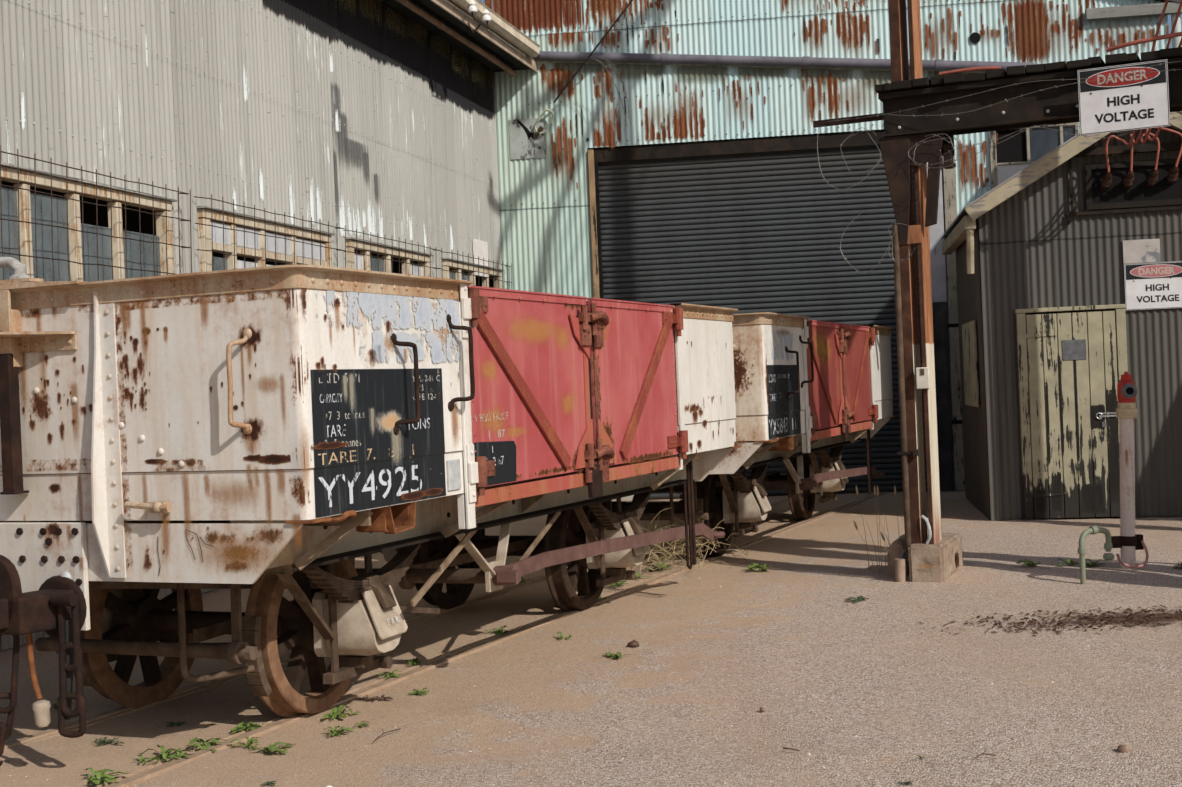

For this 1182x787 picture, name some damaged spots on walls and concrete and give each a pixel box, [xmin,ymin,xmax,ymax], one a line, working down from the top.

rust [483,0,679,51]
rust [794,0,877,54]
rust [921,0,1169,62]
rust [539,63,624,148]
rust [639,84,705,142]
rust [719,74,766,130]
rust [552,118,578,190]
rust [958,133,998,189]
peeling [1045,353,1120,514]